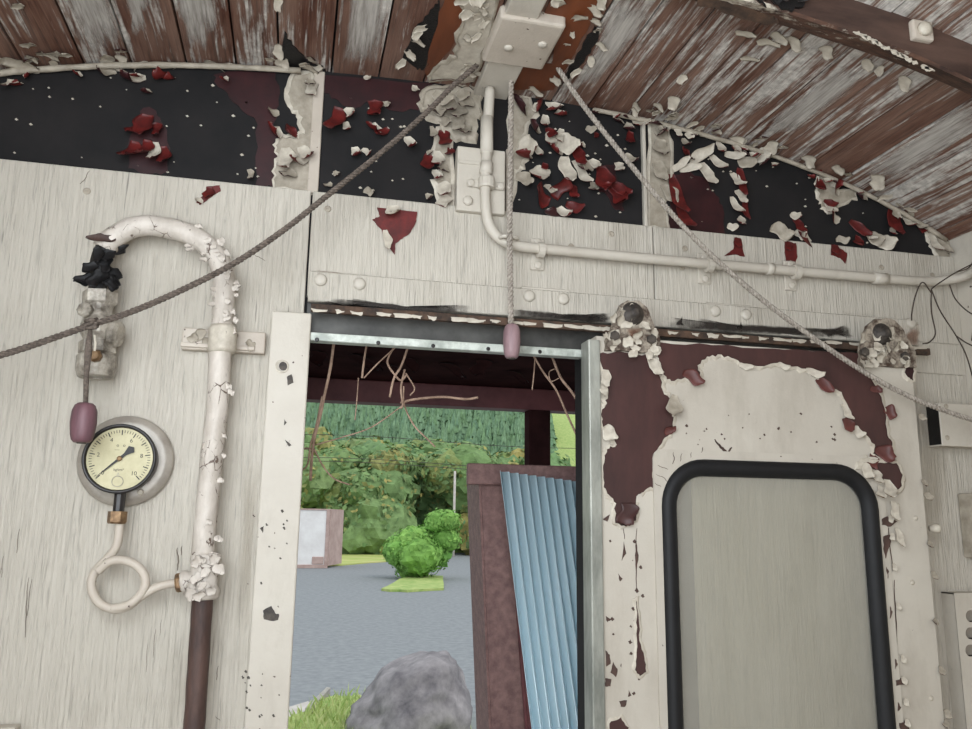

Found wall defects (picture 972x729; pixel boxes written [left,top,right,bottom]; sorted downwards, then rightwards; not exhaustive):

peeling [180,0,214,43]
peeling [96,48,176,93]
peeling [116,107,174,175]
peeling [204,0,499,207]
peeling [506,0,854,257]
peeling [770,112,972,263]
peeling [372,205,417,255]
peeling [513,303,927,574]
peeling [184,519,225,602]
peeling [605,650,618,687]
peeling [628,588,649,680]
peeling [607,692,635,729]